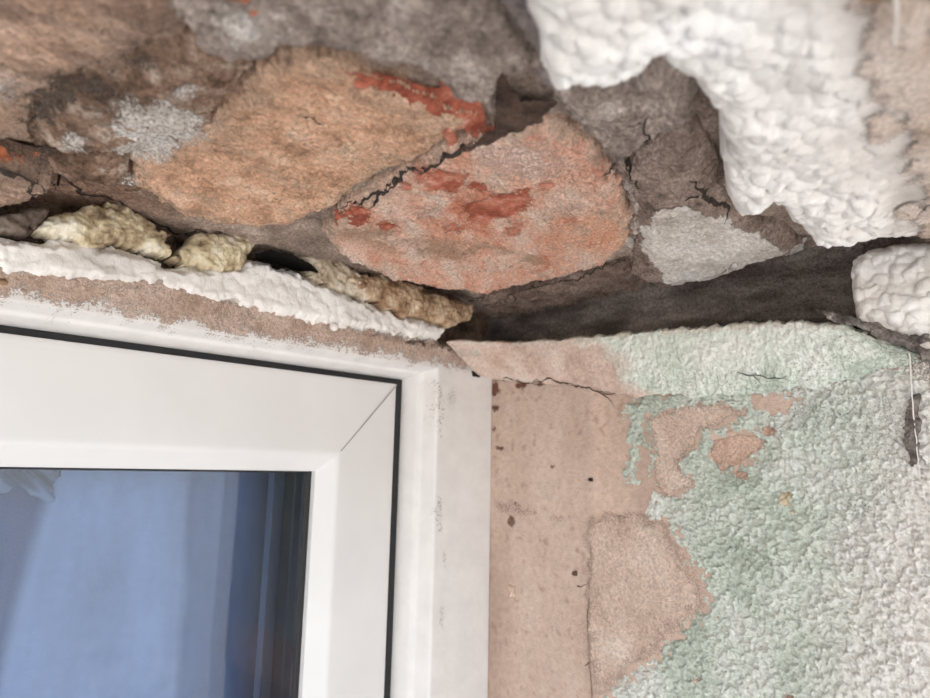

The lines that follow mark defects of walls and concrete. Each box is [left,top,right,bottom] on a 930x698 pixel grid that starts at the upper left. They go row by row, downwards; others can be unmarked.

spalling [340,68,497,146]
crack [0,168,229,248]
crack [340,131,517,210]
peeling [468,181,487,192]
crack [601,114,663,191]
crack [685,181,731,224]
peeling [789,237,808,255]
peeling [910,333,930,361]
crack [503,377,615,406]
peeling [647,403,741,497]
peeling [712,426,777,480]
peeling [572,512,705,695]